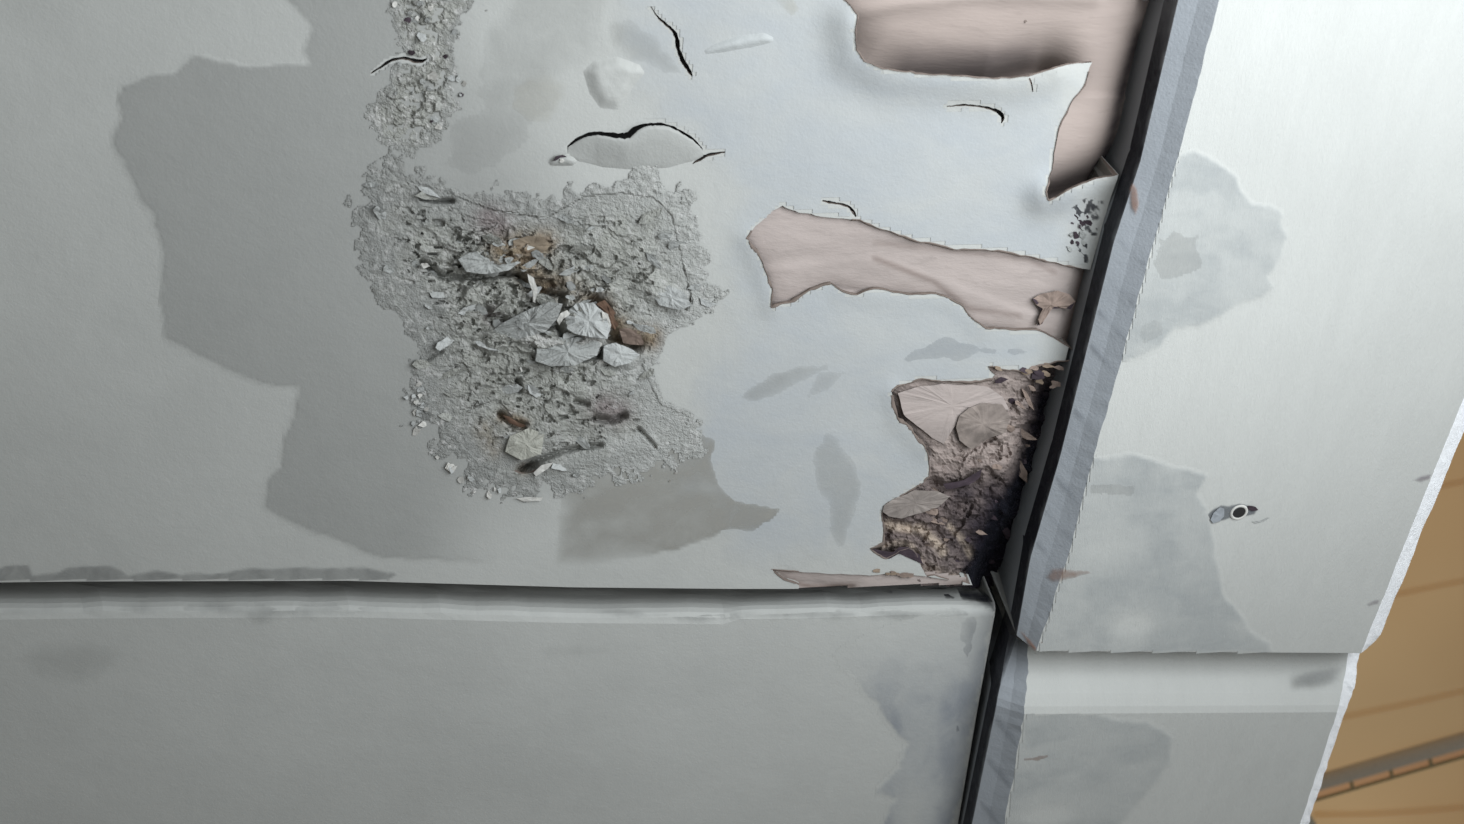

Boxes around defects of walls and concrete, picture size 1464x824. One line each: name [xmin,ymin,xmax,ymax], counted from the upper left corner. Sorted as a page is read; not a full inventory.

damp [108,0,777,565]
spalling [344,0,729,504]
crack [651,7,693,76]
peeling [746,206,1092,588]
crack [958,104,1004,121]
peeling [844,0,1149,201]